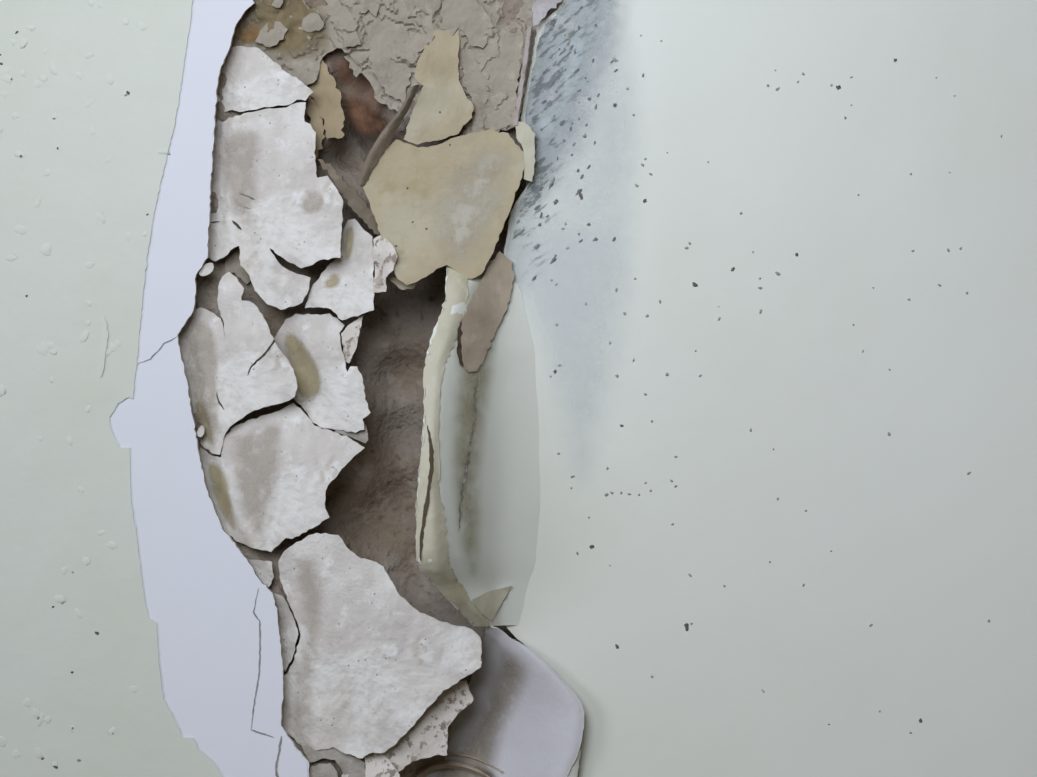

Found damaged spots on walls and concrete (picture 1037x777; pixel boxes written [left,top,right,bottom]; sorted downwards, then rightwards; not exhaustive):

leakage [512,0,612,345]
peeling [110,0,584,777]
crack [251,588,282,777]